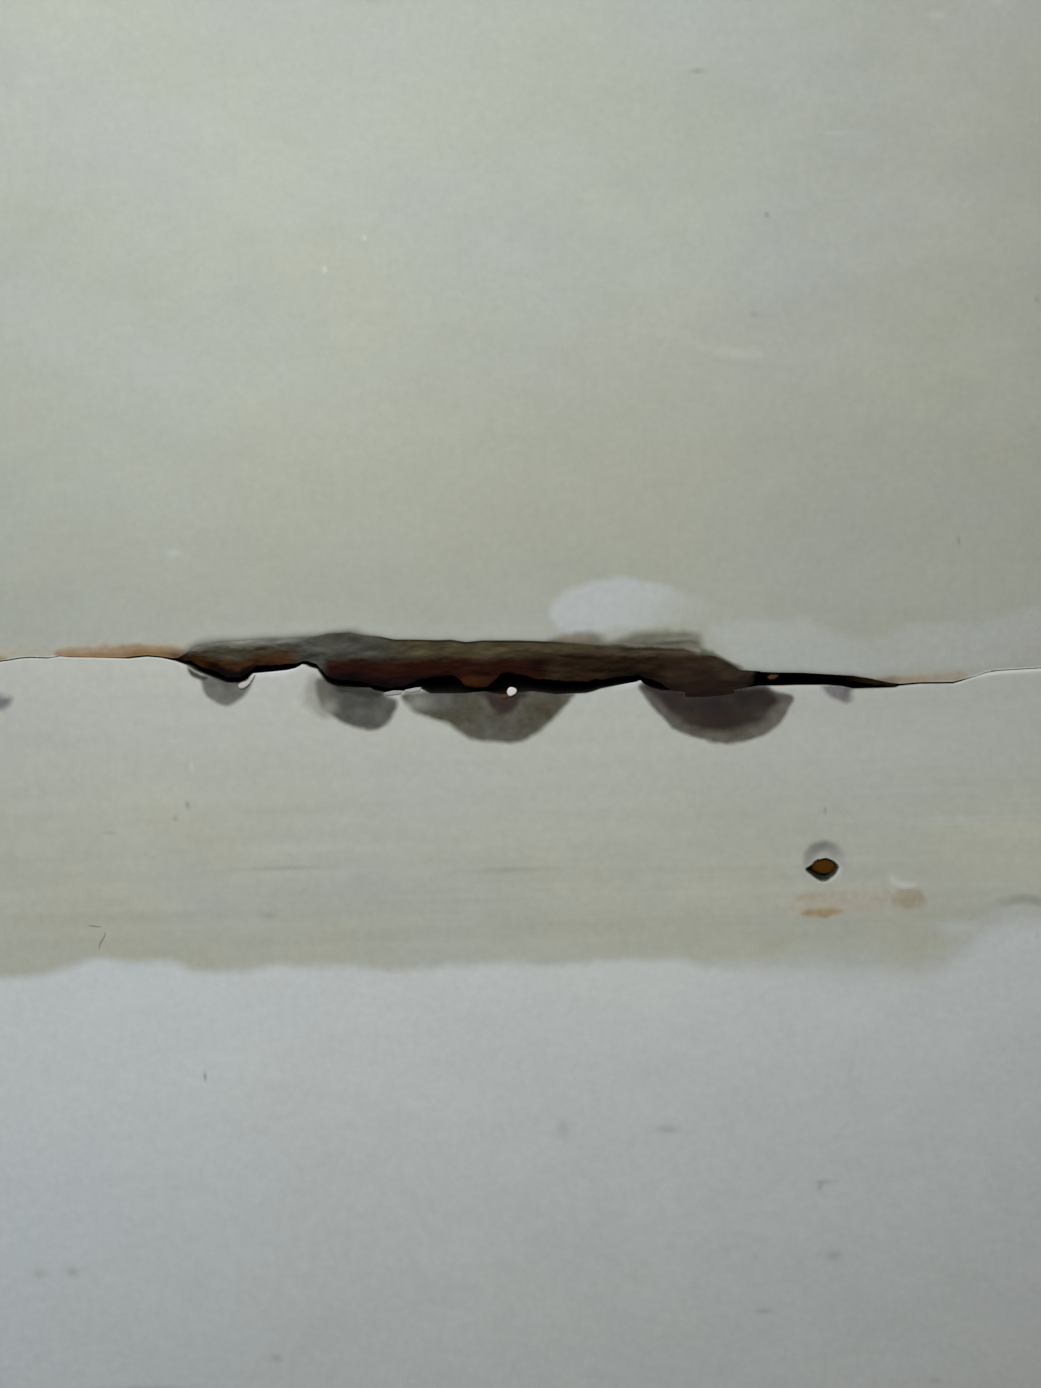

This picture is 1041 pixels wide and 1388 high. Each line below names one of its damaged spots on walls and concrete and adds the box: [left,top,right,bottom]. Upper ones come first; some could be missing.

corrosion [0,638,190,661]
crack [0,633,971,699]
leakage [544,626,746,670]
leakage [296,671,578,746]
leakage [636,680,796,747]